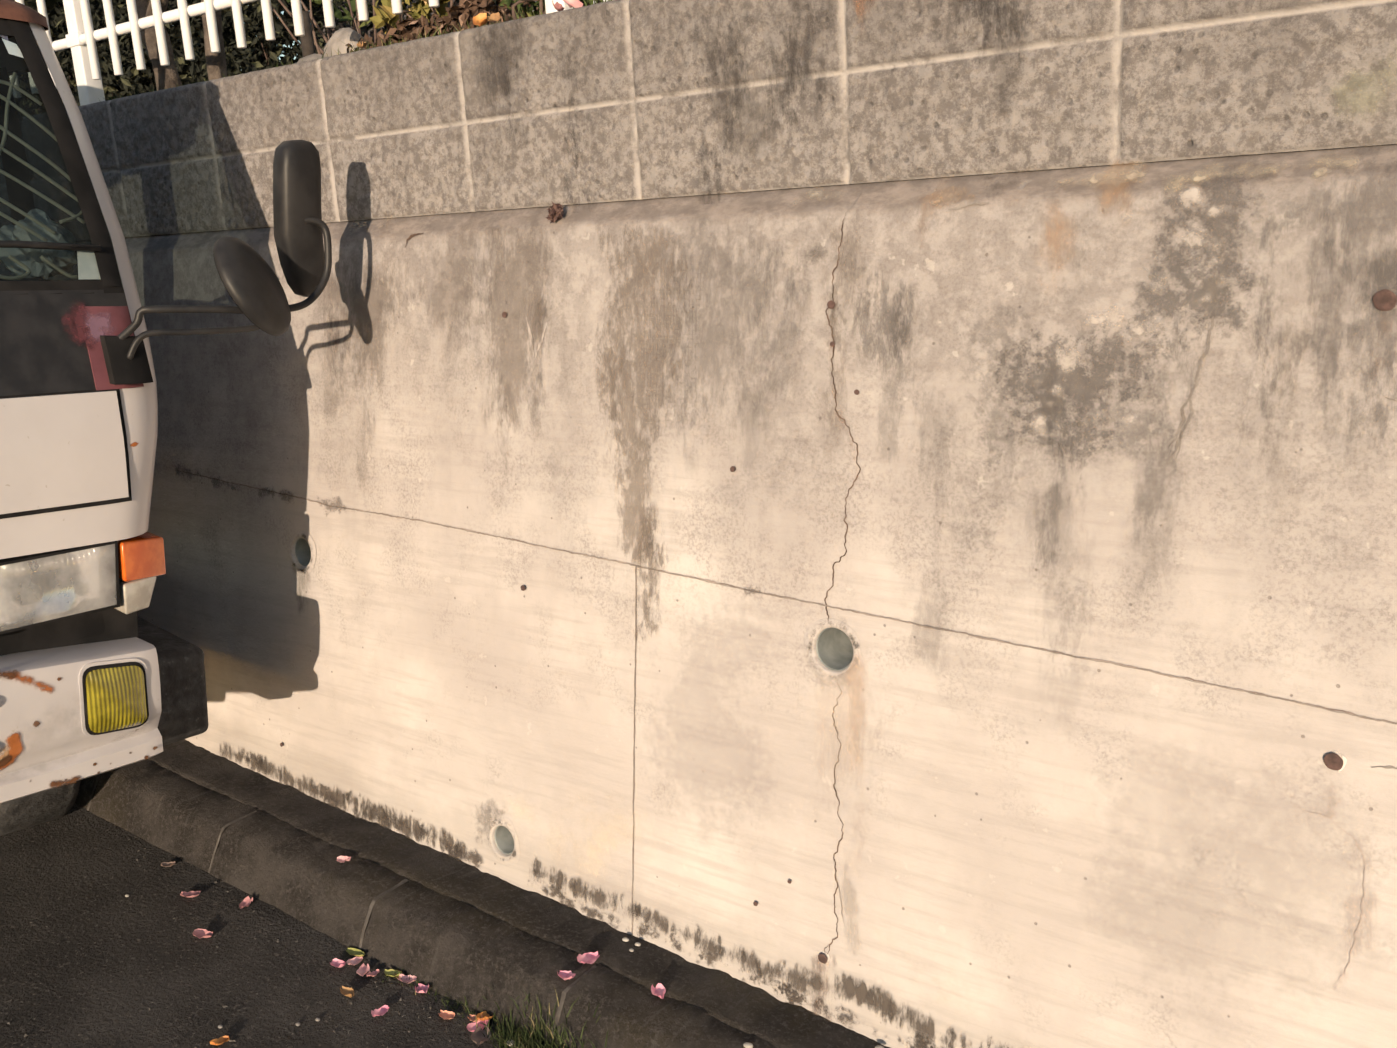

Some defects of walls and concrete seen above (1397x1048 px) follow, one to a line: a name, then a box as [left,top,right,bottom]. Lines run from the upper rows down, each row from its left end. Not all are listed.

crack [824,193,861,618]
damp [996,166,1252,458]
crack [1167,282,1229,464]
crack [824,682,844,955]